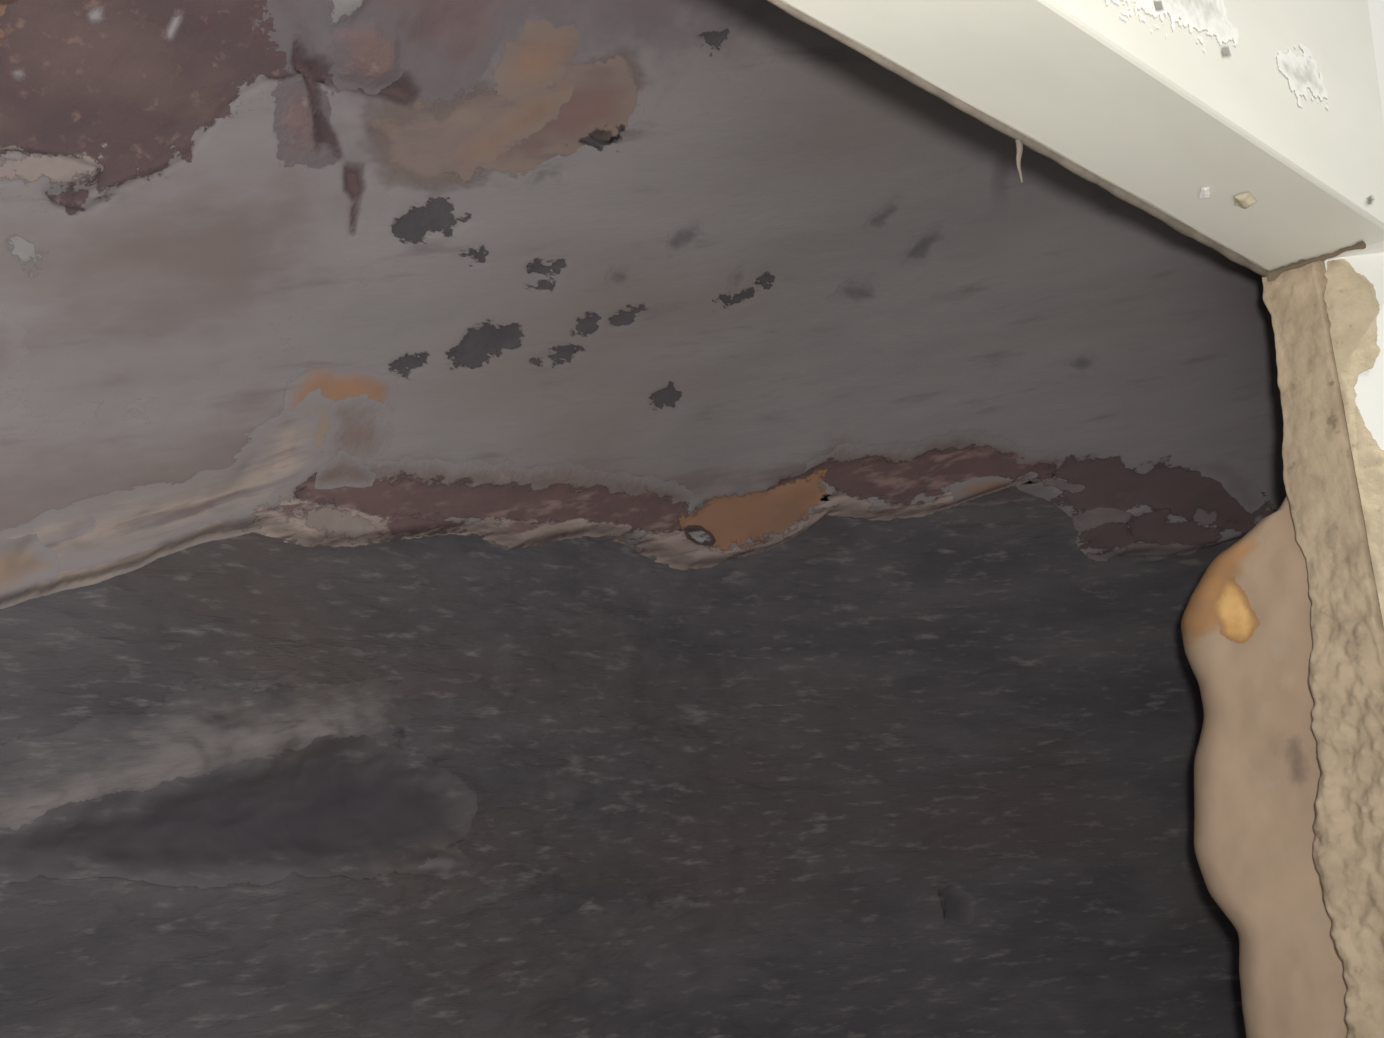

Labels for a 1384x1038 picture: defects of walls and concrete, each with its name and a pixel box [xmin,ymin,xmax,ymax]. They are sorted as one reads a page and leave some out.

flaking render [0,0,529,216]
flaking render [578,124,625,151]
leakage [0,0,784,532]
flaking render [391,197,472,244]
flaking render [461,245,489,267]
corrosion [679,469,828,564]
spalling [0,258,1384,1038]